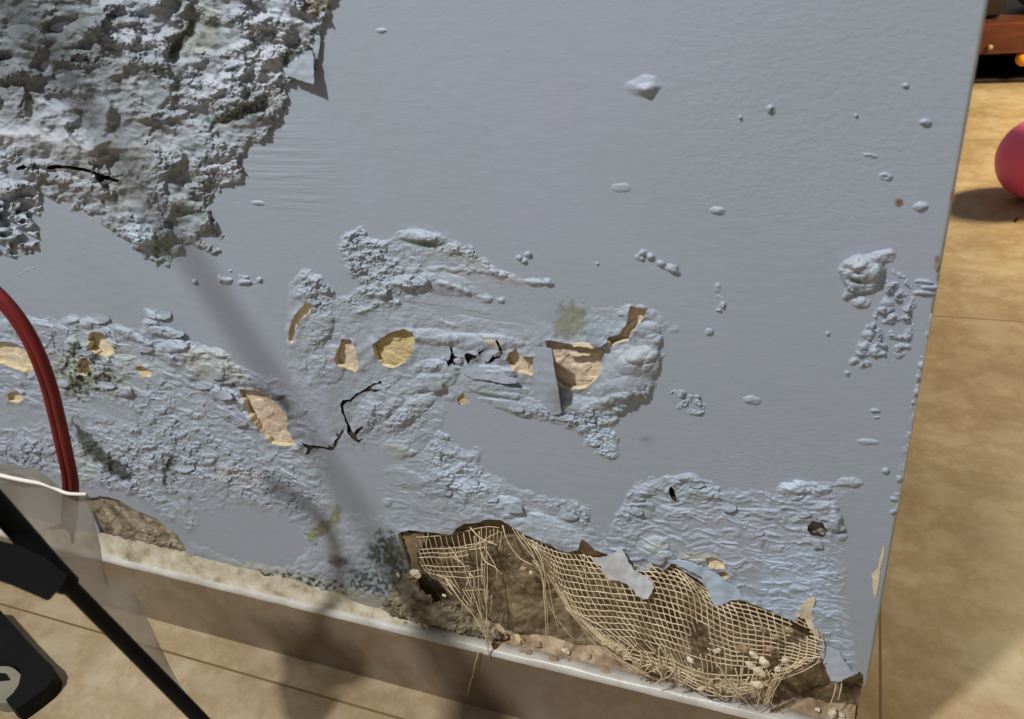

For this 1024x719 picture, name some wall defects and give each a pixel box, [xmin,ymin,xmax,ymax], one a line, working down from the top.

peeling [0,318,62,482]
crack [306,383,377,454]
spalling [26,303,863,719]